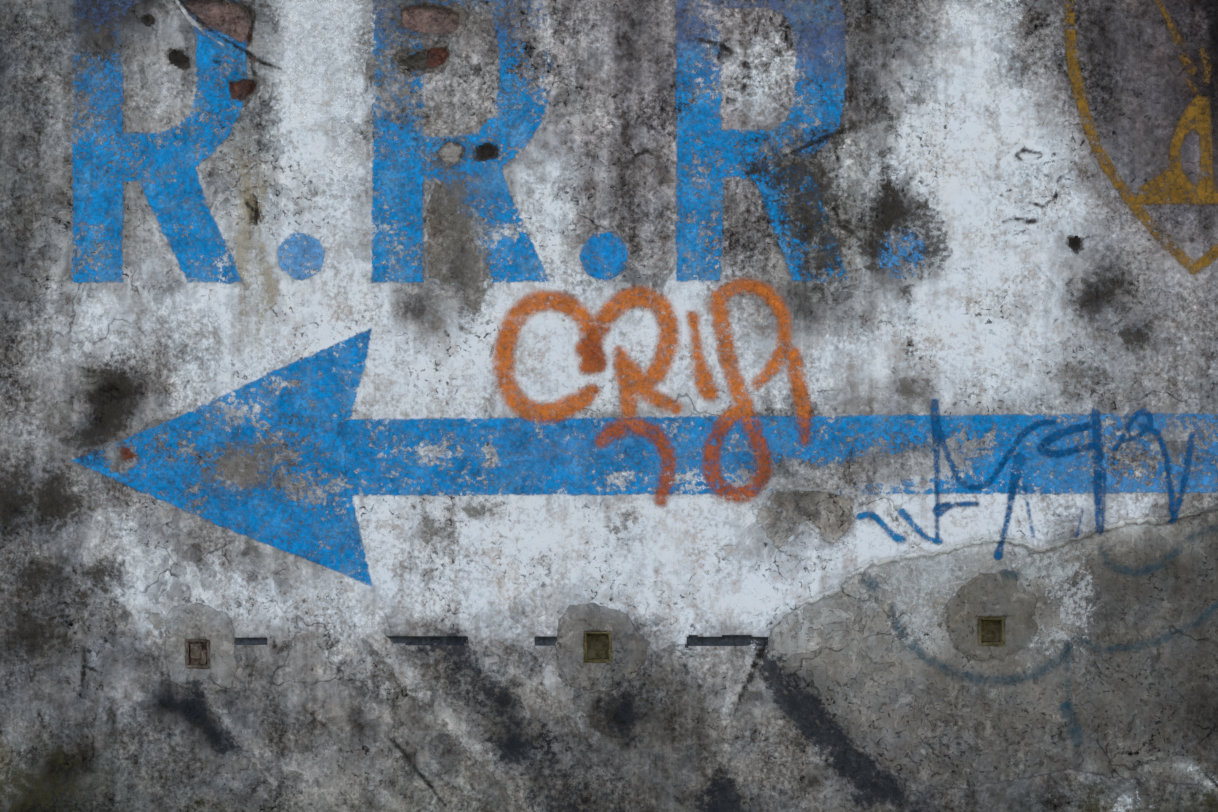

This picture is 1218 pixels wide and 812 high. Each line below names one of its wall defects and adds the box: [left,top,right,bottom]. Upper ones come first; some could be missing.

spalling [167,48,191,69]
flaking render [174,0,256,47]
crack [175,0,281,89]
flaking render [213,59,265,107]
flaking render [391,0,468,77]
flaking render [752,486,859,549]
flaking render [767,505,1218,795]
water stain [754,640,923,812]
water stain [675,766,751,812]